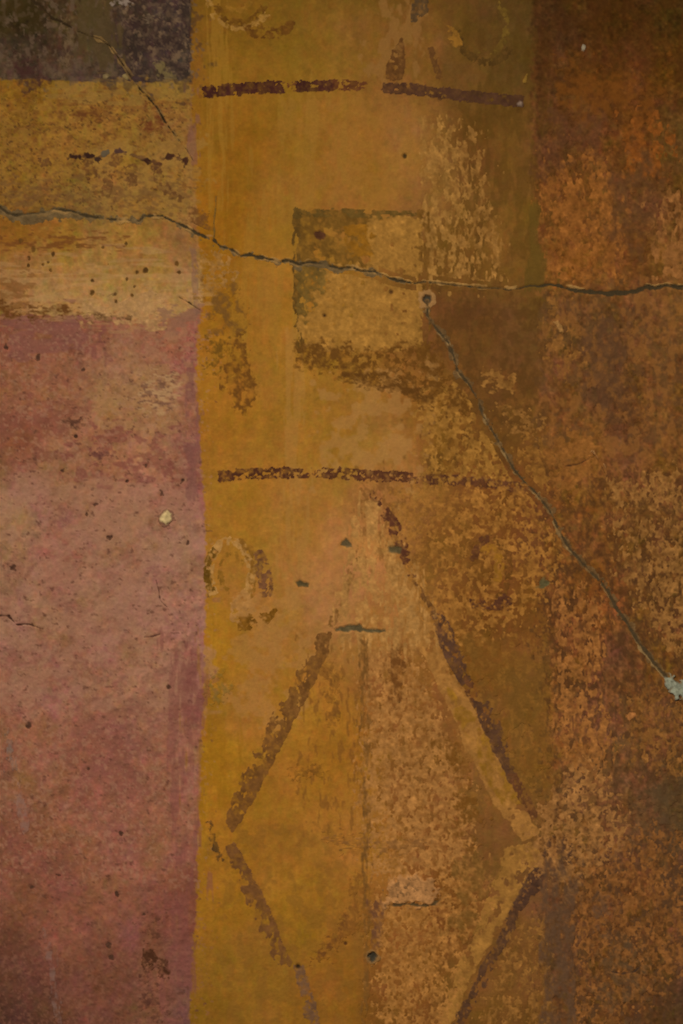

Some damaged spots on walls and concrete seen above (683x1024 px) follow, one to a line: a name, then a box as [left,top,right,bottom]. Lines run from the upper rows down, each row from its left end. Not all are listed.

crack [31,0,193,160]
crack [0,196,683,700]